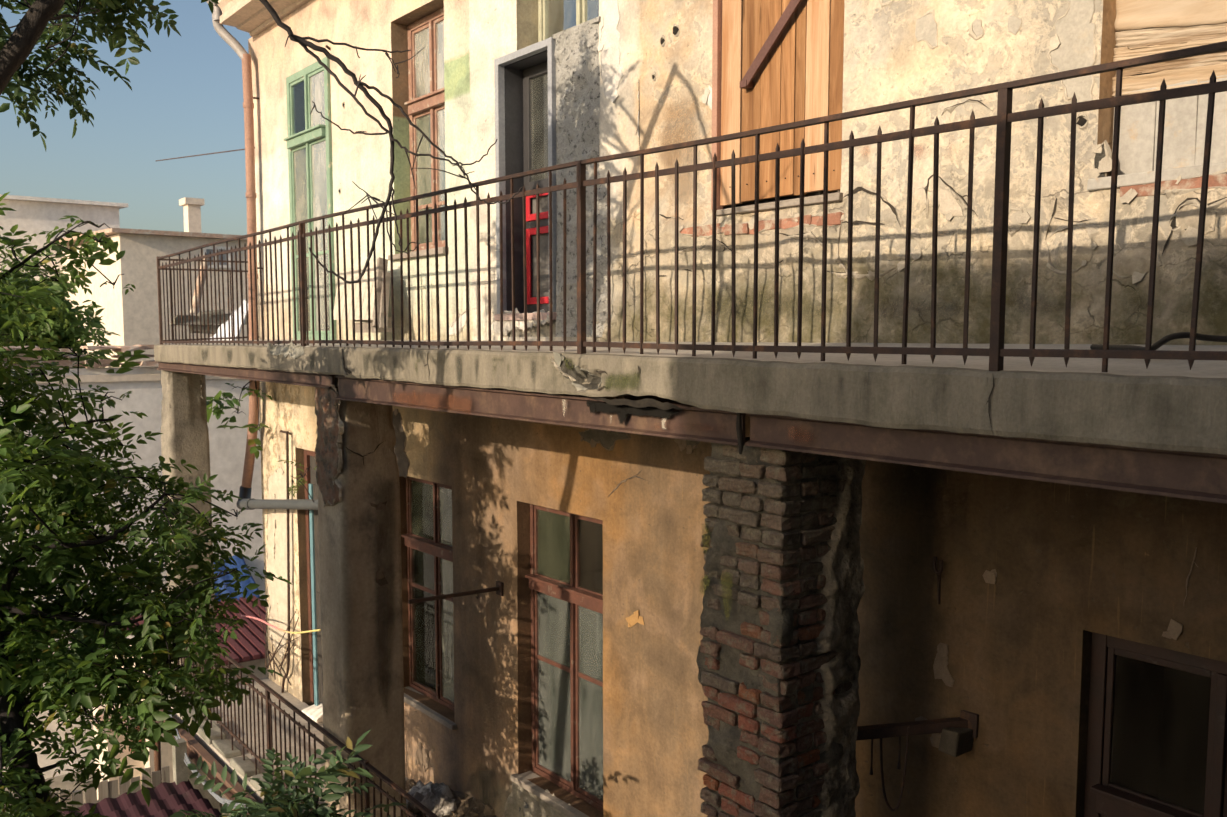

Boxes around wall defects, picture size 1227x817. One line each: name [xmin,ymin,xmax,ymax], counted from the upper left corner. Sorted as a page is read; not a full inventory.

peeling [968,19,984,41]
peeling [1047,0,1098,103]
crack [924,175,978,219]
crack [1043,198,1090,240]
crack [1162,197,1227,255]
spalling [551,351,683,410]
crack [986,377,994,430]
spalling [314,384,344,507]
peeling [393,409,410,478]
peeling [1162,619,1183,640]
spalling [933,643,955,687]